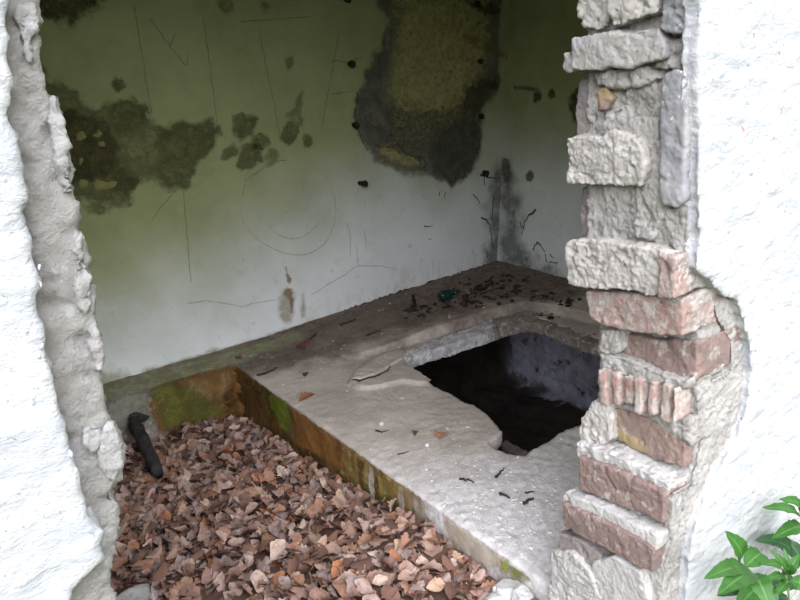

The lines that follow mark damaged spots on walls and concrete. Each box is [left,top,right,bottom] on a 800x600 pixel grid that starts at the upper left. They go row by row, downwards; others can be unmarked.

mould [42,67,220,214]
mould [222,113,277,169]
mould [281,94,312,147]
leakage [353,0,502,187]
leakage [485,159,550,273]
crack [352,366,390,382]